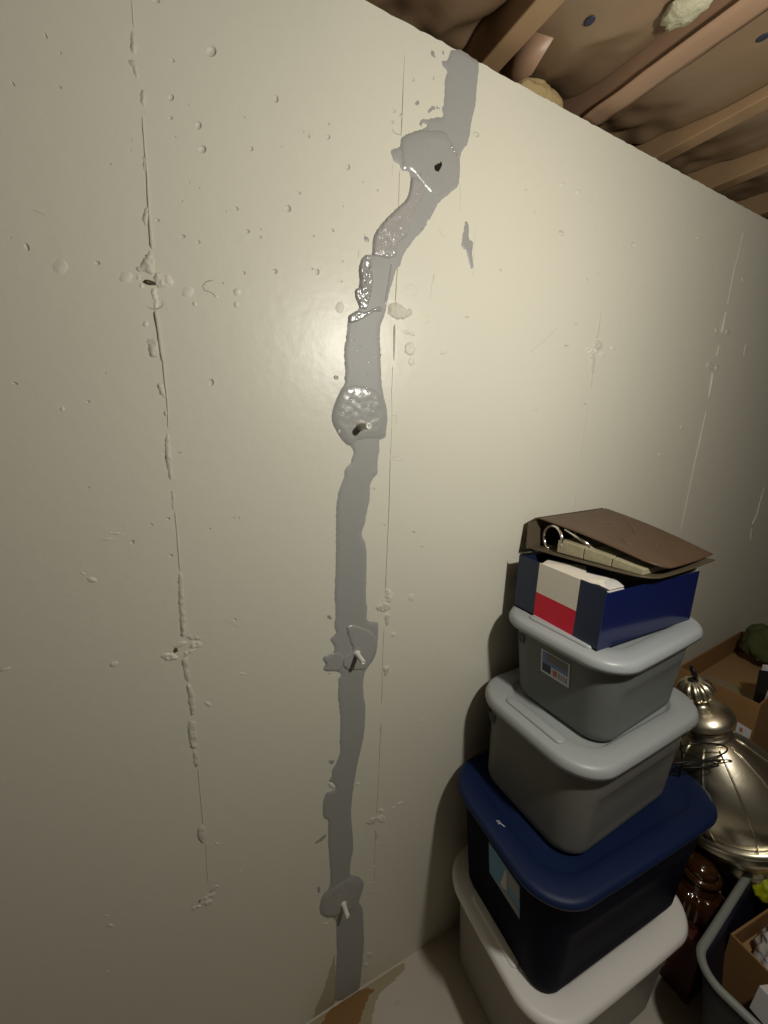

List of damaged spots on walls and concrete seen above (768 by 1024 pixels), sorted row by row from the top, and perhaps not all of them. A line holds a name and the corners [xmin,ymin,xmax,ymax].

crack [142,116,153,249]
crack [147,301,169,428]
crack [173,512,181,570]
crack [319,49,479,1001]
corrosion [321,988,374,1024]